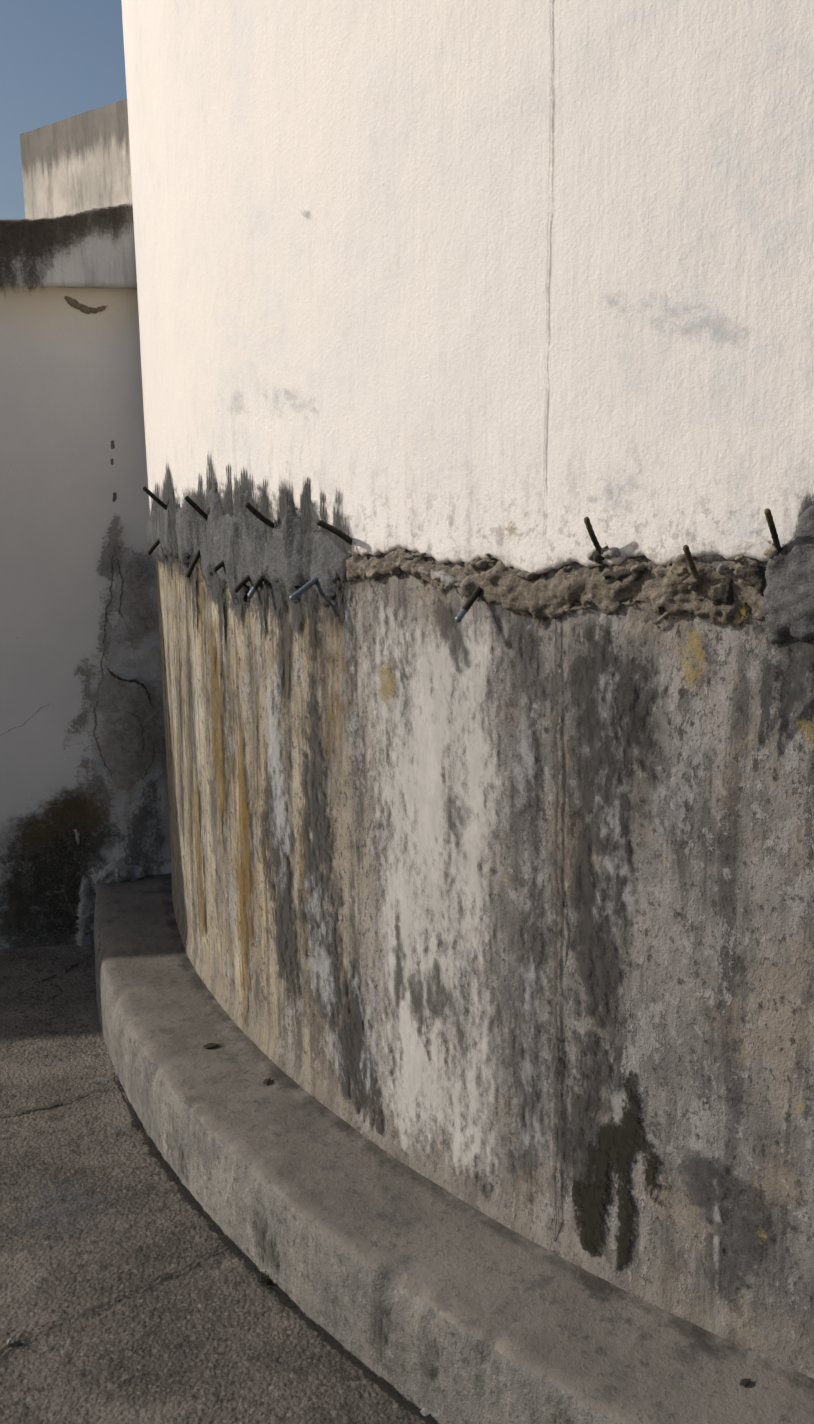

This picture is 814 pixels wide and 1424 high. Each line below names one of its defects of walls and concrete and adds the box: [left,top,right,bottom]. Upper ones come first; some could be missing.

leakage [0,220,43,289]
leakage [0,596,181,948]
leakage [249,667,301,1017]
leakage [273,613,289,713]
leakage [753,655,808,773]
leakage [343,978,384,1136]
leakage [551,1057,662,1271]
leakage [680,1157,769,1305]